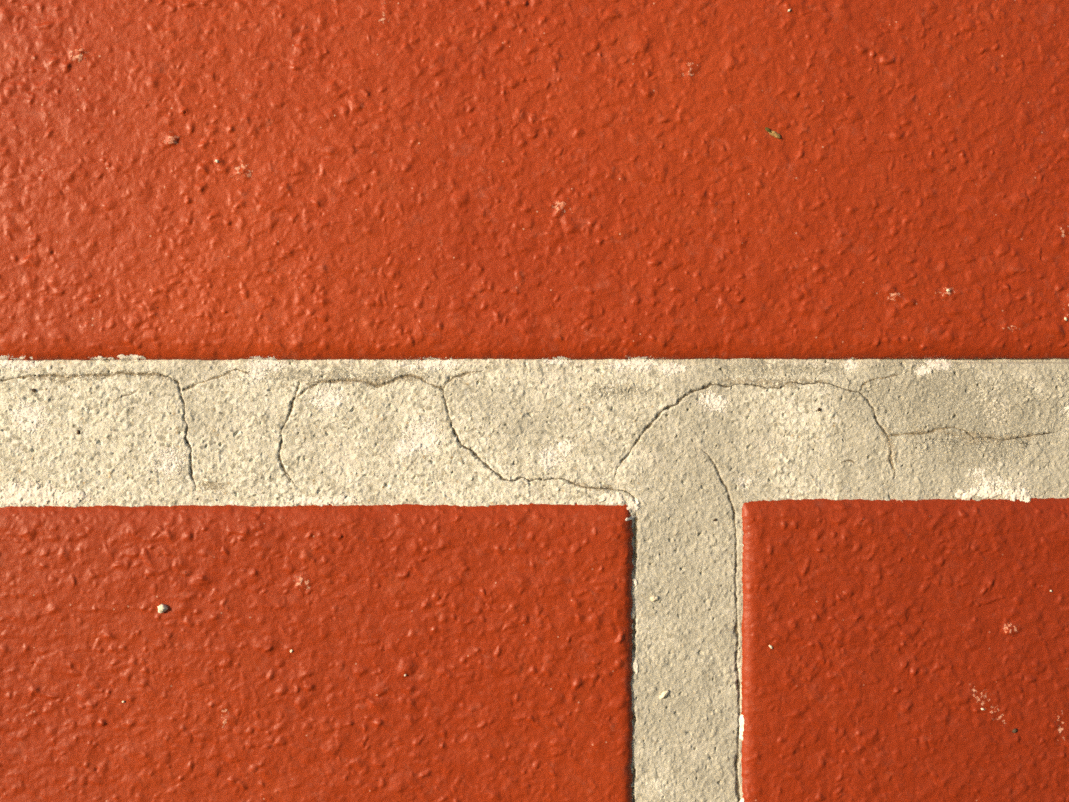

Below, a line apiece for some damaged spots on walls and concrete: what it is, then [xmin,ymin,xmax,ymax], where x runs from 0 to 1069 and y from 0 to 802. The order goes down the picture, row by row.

crack [0,368,249,493]
crack [278,370,1055,574]
crack [630,609,638,654]
crack [701,449,741,802]
crack [630,766,638,802]